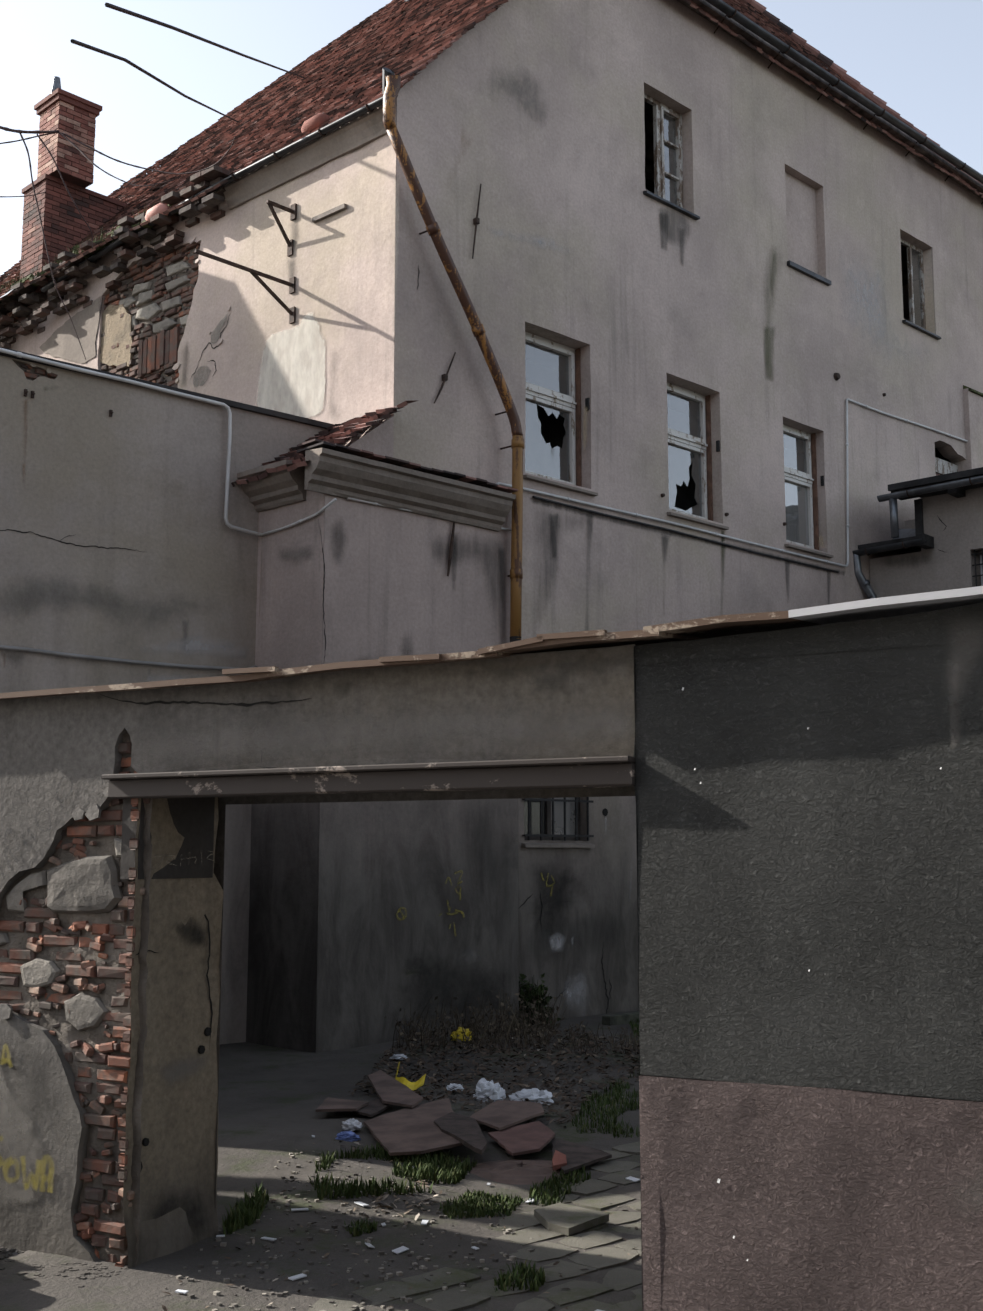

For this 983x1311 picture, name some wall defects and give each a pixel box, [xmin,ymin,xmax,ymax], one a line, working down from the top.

flaking render [100,237,211,388]
spalling [15,362,58,381]
crack [0,529,141,552]
spalling [118,732,137,774]
spalling [0,787,153,1267]